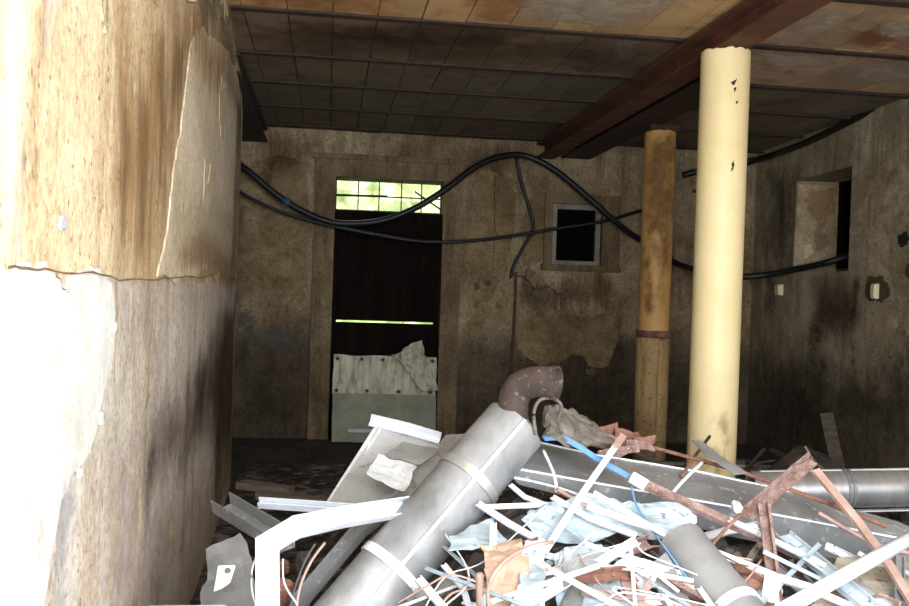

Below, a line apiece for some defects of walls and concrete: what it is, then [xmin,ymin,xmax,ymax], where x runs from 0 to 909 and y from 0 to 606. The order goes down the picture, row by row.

spalling [98,0,113,35]
water stain [484,0,681,28]
water stain [168,20,195,112]
water stain [119,62,156,250]
flaking render [157,16,313,314]
spalling [898,231,909,247]
spalling [865,276,890,303]
peeling [516,309,619,376]
rust [636,329,670,339]
crack [8,265,237,498]
peeling [0,262,117,606]